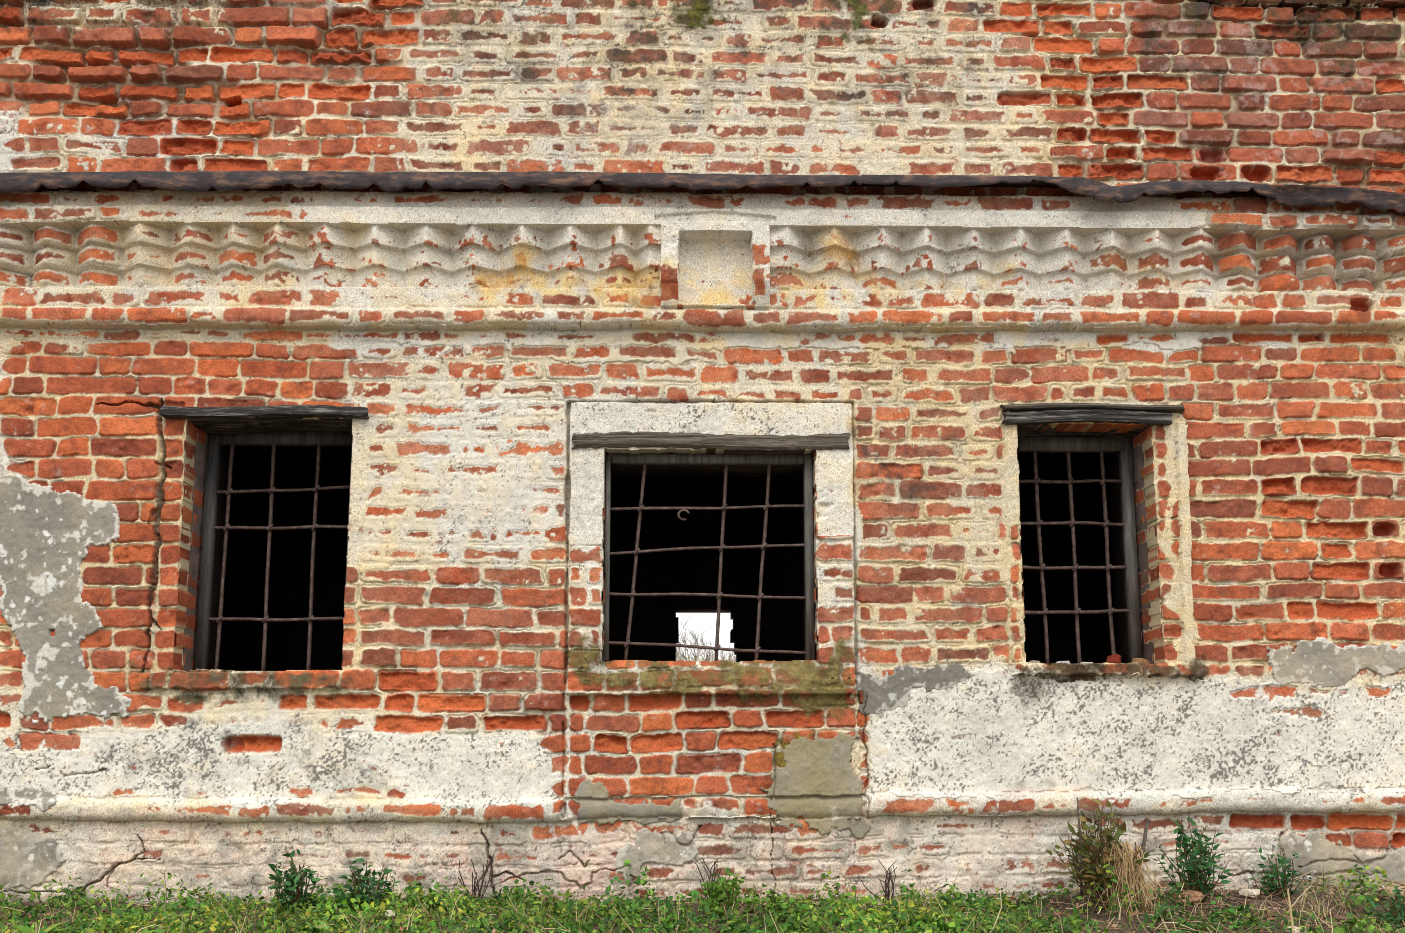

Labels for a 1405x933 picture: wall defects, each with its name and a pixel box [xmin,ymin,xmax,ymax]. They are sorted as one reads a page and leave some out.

water stain [673,0,726,29]
spalling [0,0,427,173]
peeling [393,319,950,366]
peeling [989,297,1394,354]
peeling [863,424,1405,800]
water stain [567,636,603,679]
water stain [774,637,851,718]
peeling [0,667,569,809]
spalling [593,690,826,755]
crack [476,828,617,896]
peeling [502,825,640,865]
peeling [867,811,1405,894]